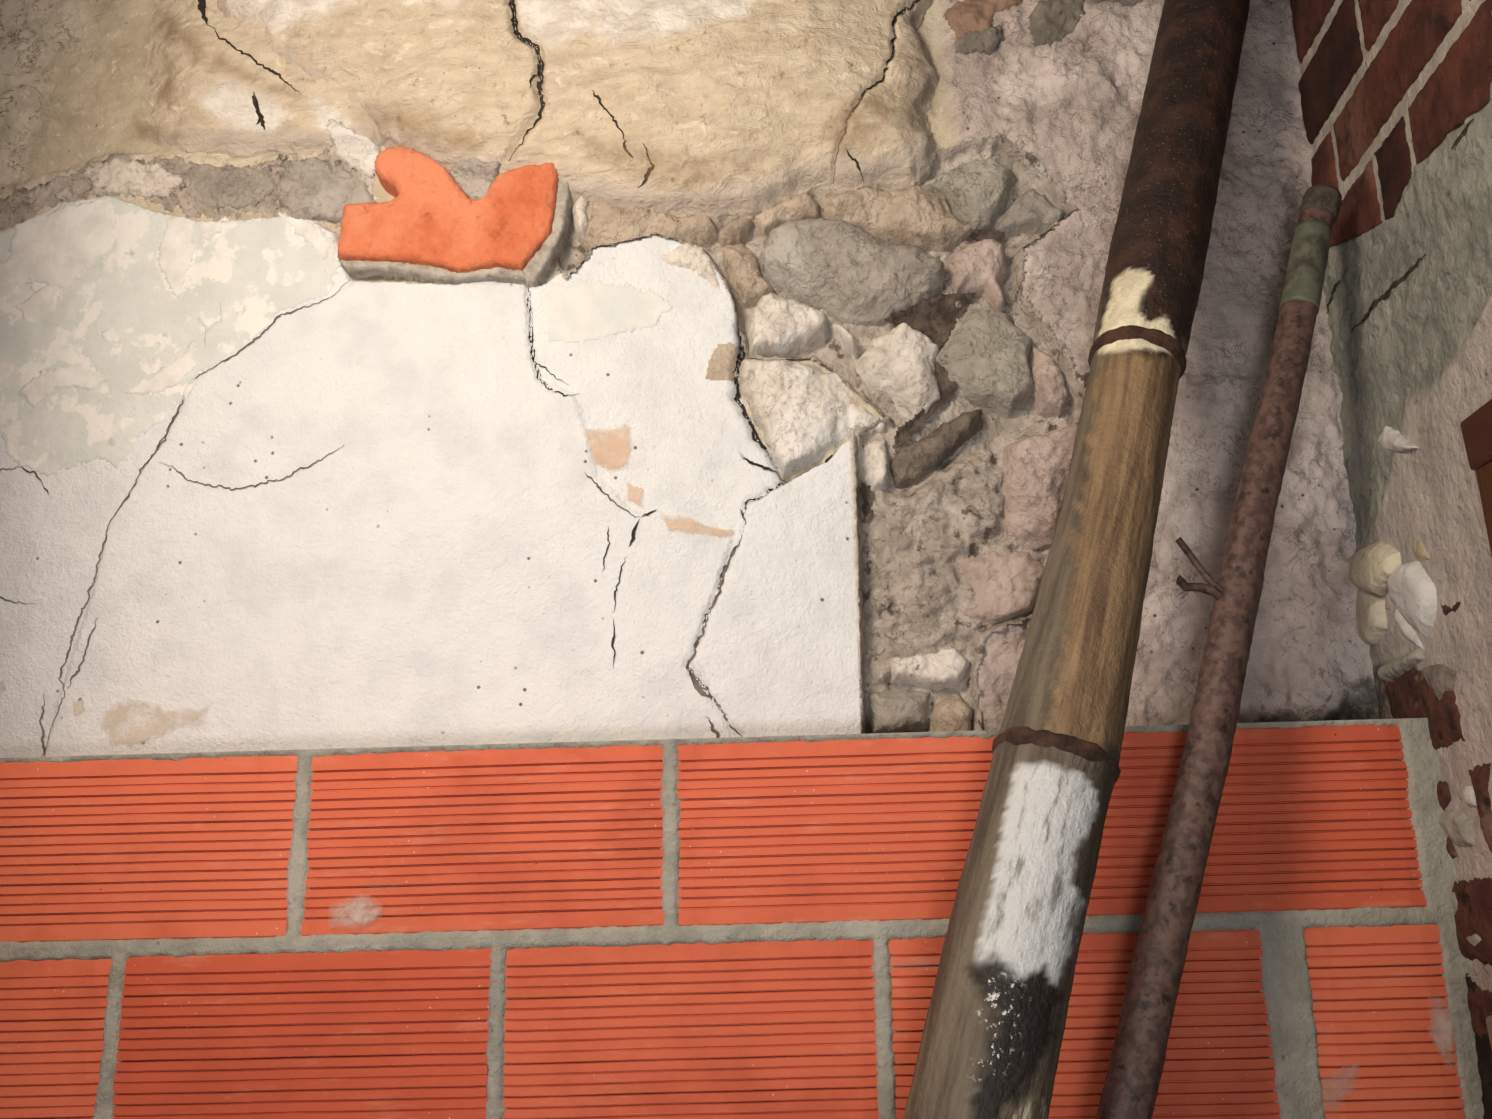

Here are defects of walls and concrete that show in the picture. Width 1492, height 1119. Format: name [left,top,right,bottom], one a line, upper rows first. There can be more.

crack [198,0,301,130]
crack [508,0,545,161]
crack [833,0,920,182]
spalling [942,0,1142,56]
flaking render [1288,0,1492,247]
peeling [0,119,381,476]
crack [39,280,353,757]
crack [584,471,657,664]
crack [686,328,855,738]
spalling [556,133,1089,734]
flaking render [1437,763,1492,859]
flaking render [1450,877,1492,965]